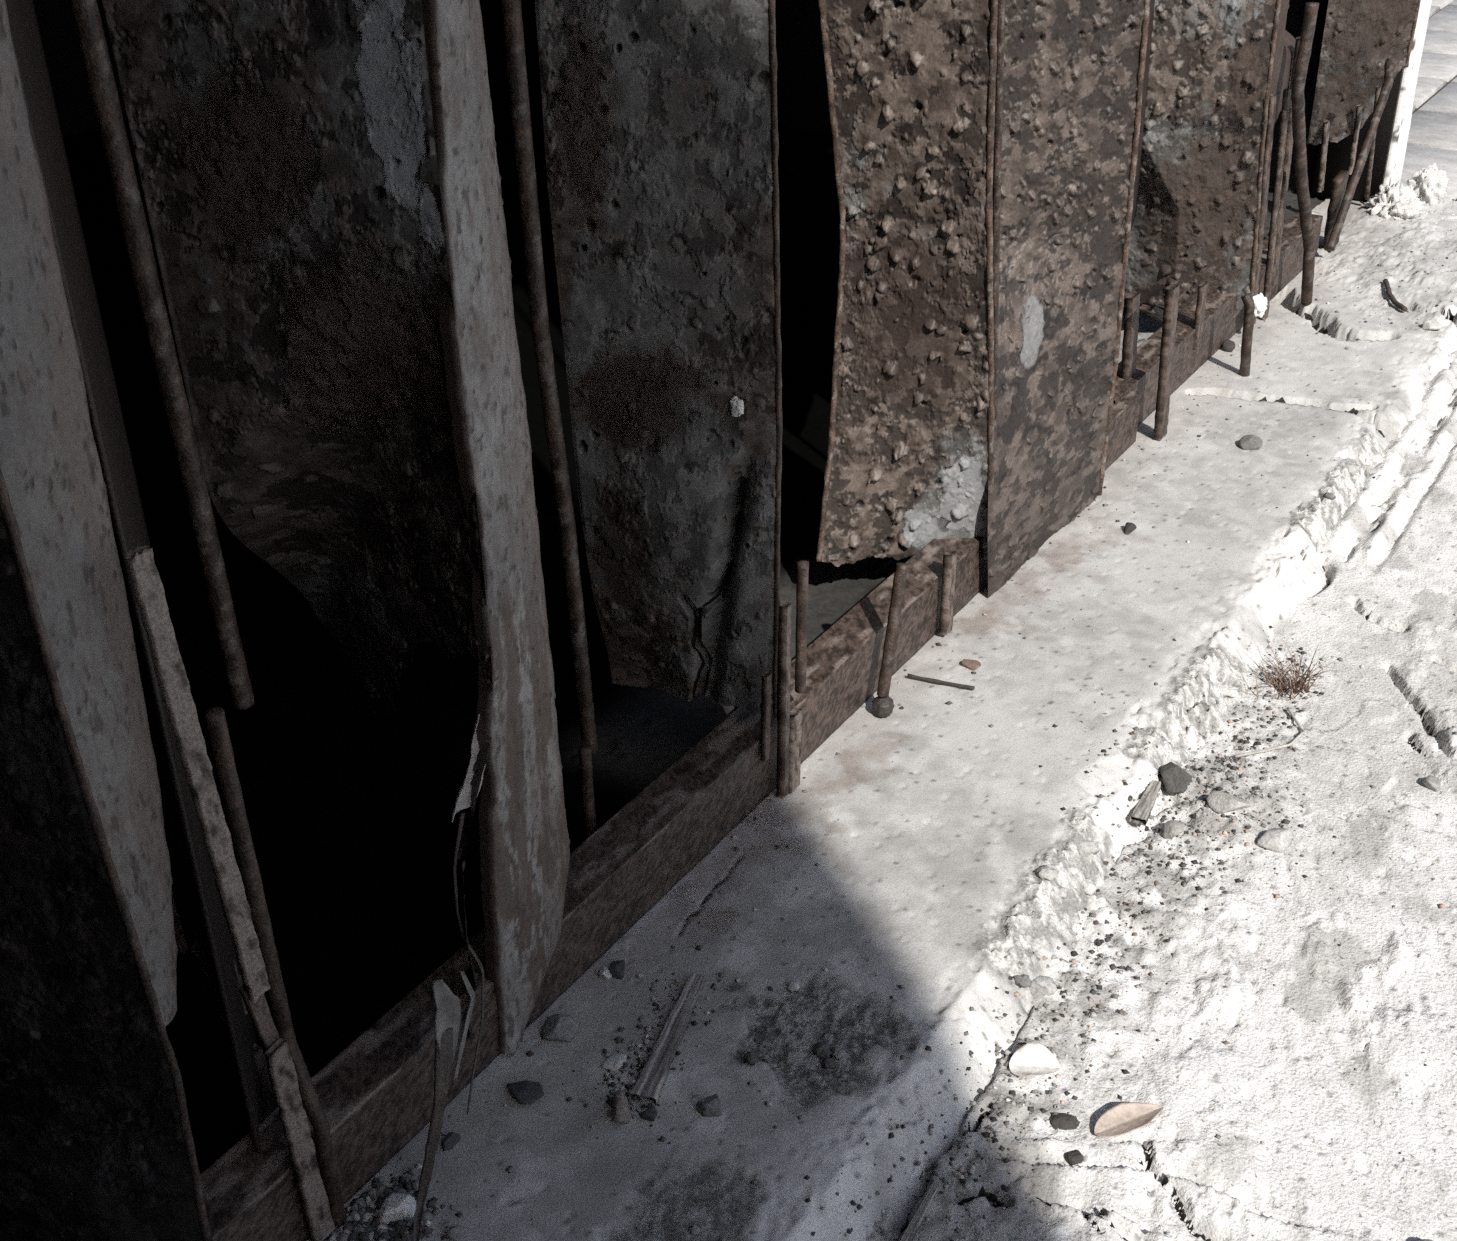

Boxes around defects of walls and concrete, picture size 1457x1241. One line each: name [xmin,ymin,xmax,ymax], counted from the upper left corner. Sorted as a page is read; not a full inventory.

corrosion [1143,43,1264,295]